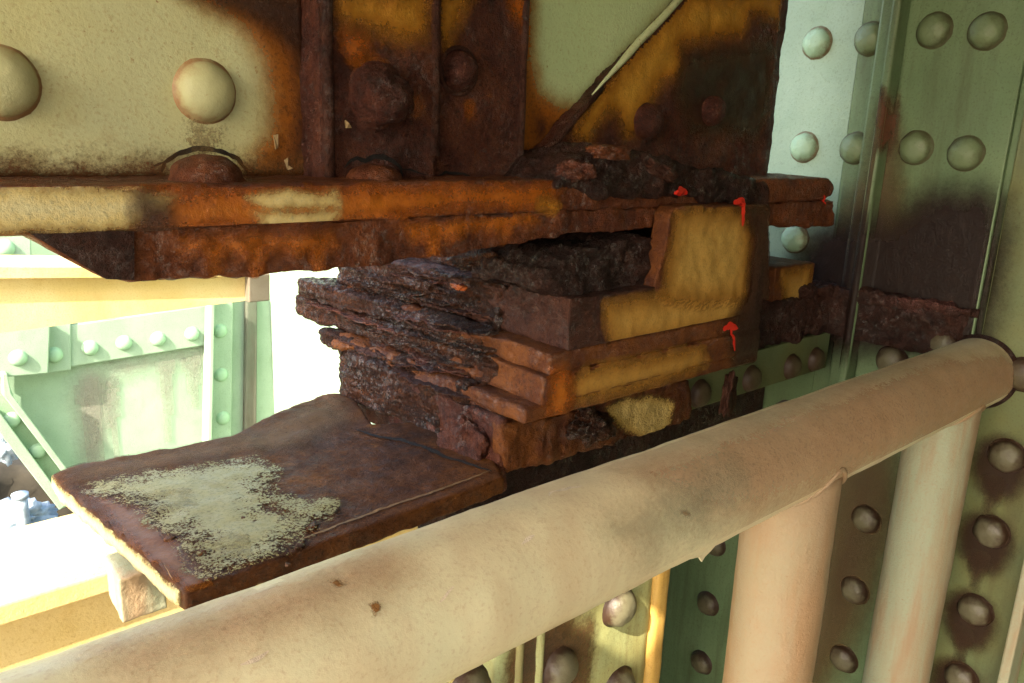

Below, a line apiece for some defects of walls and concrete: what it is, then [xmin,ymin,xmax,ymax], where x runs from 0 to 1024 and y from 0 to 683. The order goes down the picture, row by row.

corrosion [508,0,571,150]
corrosion [0,0,561,480]
peeling [605,207,751,341]
corrosion [793,87,1010,360]
peeling [571,347,707,436]
corrosion [89,493,220,600]